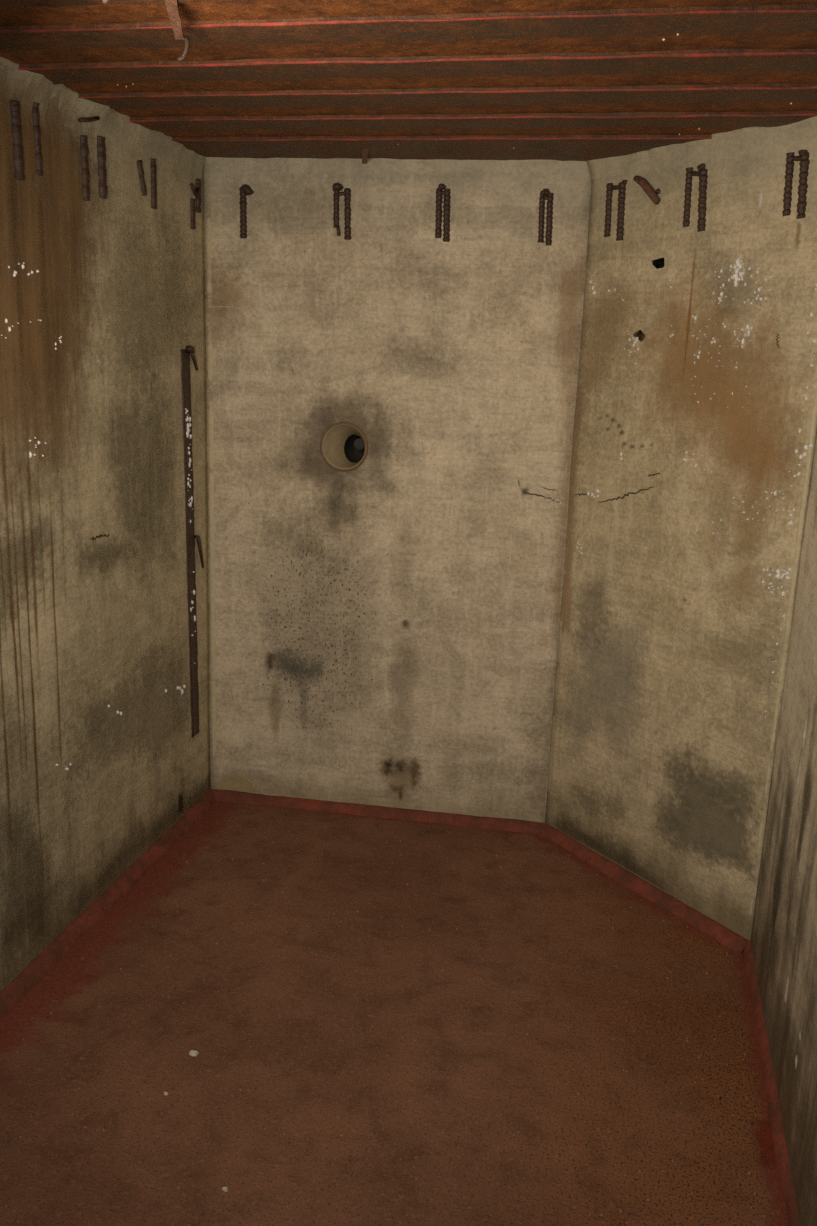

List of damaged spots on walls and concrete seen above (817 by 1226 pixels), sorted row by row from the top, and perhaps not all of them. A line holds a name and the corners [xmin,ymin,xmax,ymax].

corrosion [0,88,91,495]
corrosion [664,270,770,478]
water stain [691,314,753,404]
water stain [713,258,772,308]
crack [518,472,660,502]
corrosion [0,524,39,814]
corrosion [51,531,61,738]
water stain [657,752,752,871]
water stain [773,714,810,918]